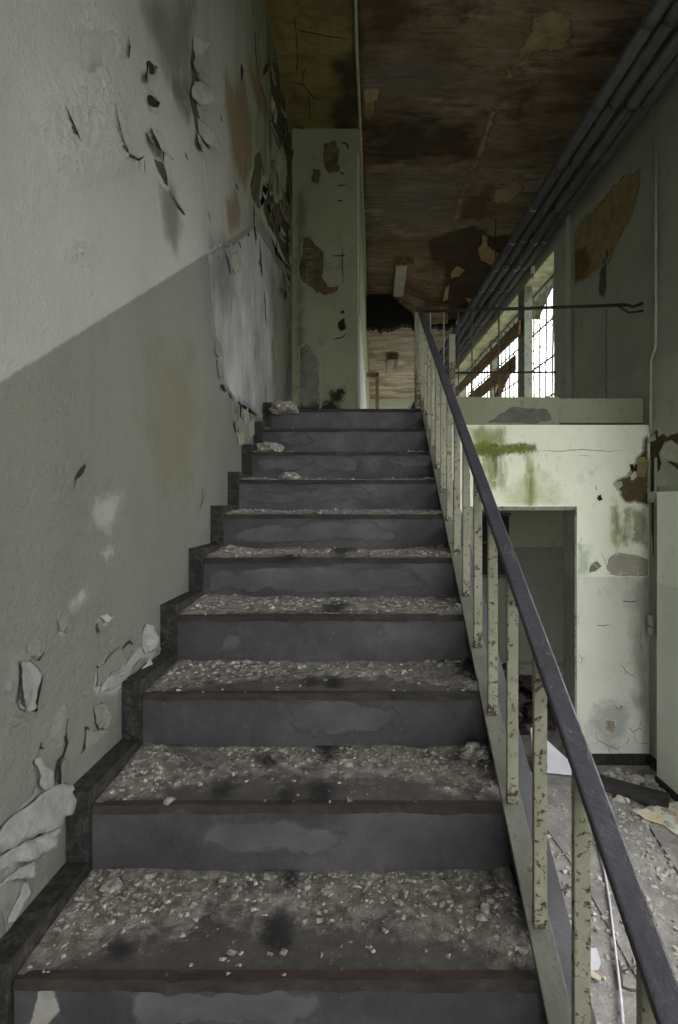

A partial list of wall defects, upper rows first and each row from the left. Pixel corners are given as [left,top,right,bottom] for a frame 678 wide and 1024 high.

hole [139,53,160,115]
peeling [147,128,173,192]
peeling [189,34,221,152]
damp [331,52,480,165]
peeling [207,35,343,446]
peeling [574,164,643,295]
flaking render [590,425,678,576]
peeling [10,652,45,723]
peeling [93,623,161,694]
peeling [0,757,77,932]